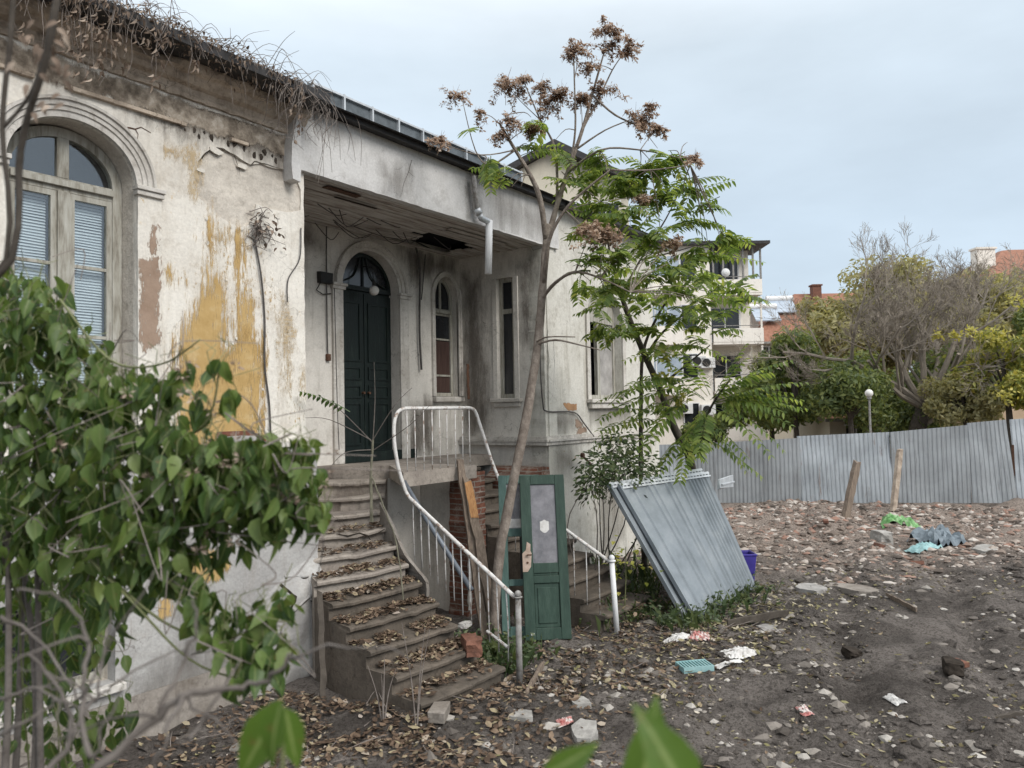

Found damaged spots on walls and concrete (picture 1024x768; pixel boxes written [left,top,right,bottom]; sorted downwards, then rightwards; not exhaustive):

peeling [139,127,306,445]
flaking render [563,403,587,434]